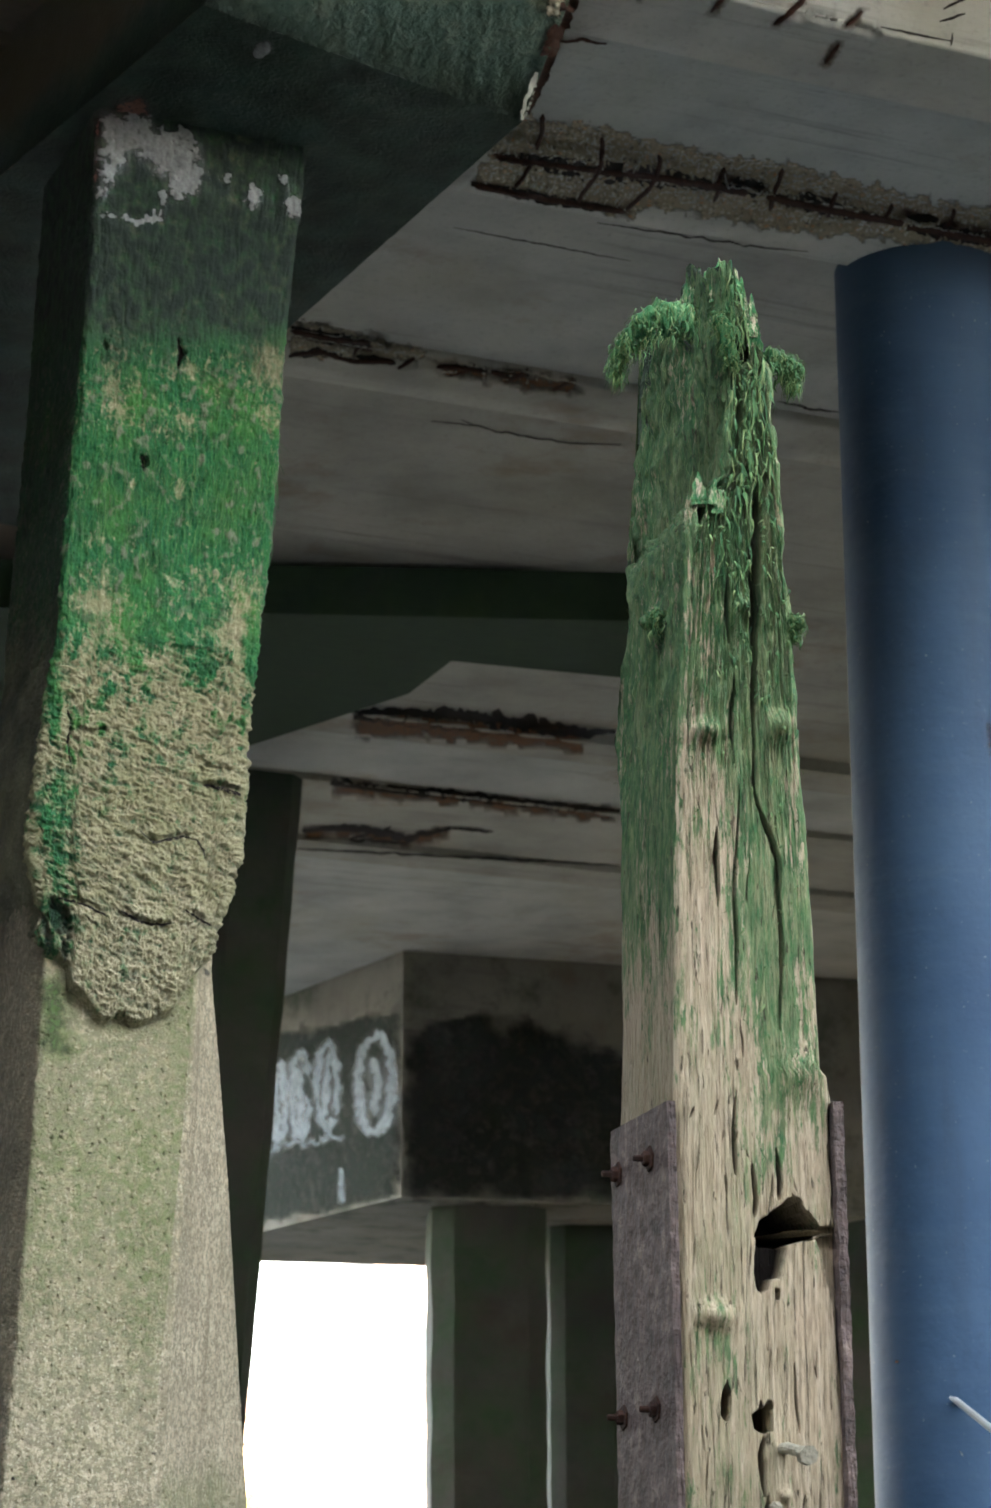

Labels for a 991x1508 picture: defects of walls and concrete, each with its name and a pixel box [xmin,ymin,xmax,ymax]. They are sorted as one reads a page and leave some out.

crack [880,0,965,46]
peeling [94,112,205,227]
peeling [241,182,265,211]
peeling [278,174,301,219]
spalling [471,112,991,252]
spalling [288,320,577,396]
spalling [354,706,616,754]
spalling [330,777,620,822]
spalling [302,823,493,847]